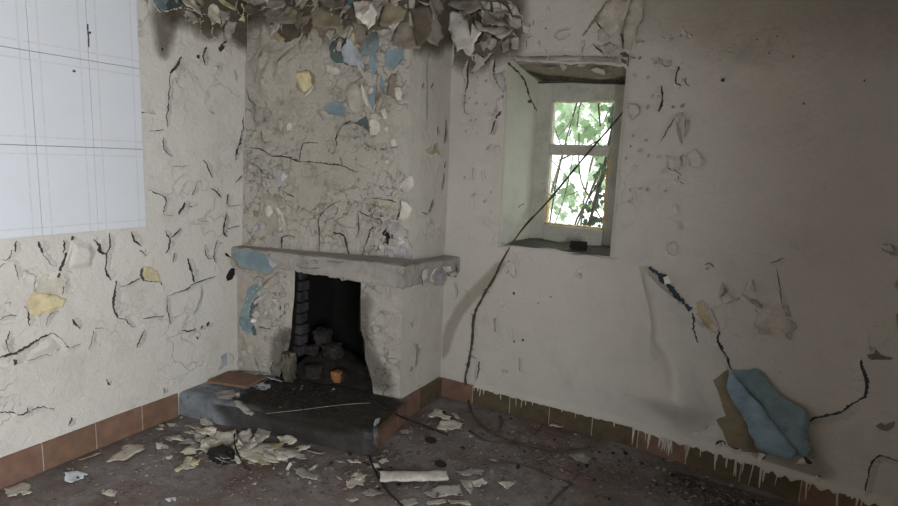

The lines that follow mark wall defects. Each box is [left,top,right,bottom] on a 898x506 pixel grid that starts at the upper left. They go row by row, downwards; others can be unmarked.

peeling [144,0,683,175]
crack [0,30,358,365]
crack [278,197,401,281]
crack [422,165,446,215]
peeling [19,269,66,317]
peeling [216,248,288,373]
crack [648,266,731,370]
crack [0,406,77,426]
crack [810,358,870,426]